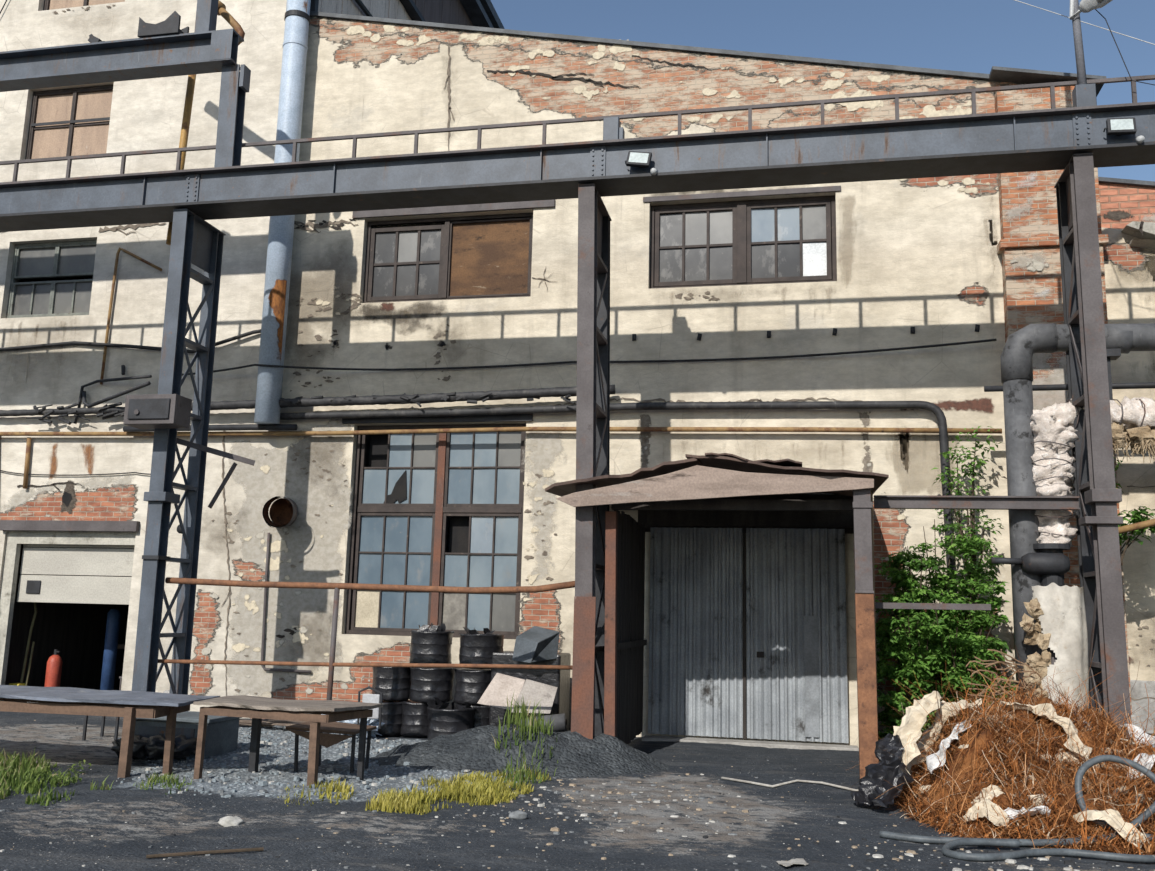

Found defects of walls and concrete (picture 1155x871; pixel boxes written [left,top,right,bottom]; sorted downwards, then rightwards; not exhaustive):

crack [444,46,454,151]
flaking render [308,16,1021,137]
corrosion [268,279,287,360]
flaking render [290,329,340,391]
leakage [364,303,456,381]
flaking render [956,282,990,308]
flaking render [859,412,873,472]
flaking render [0,475,138,521]
flaking render [189,419,411,714]
flaking render [873,492,913,709]
flaking render [952,600,1009,685]